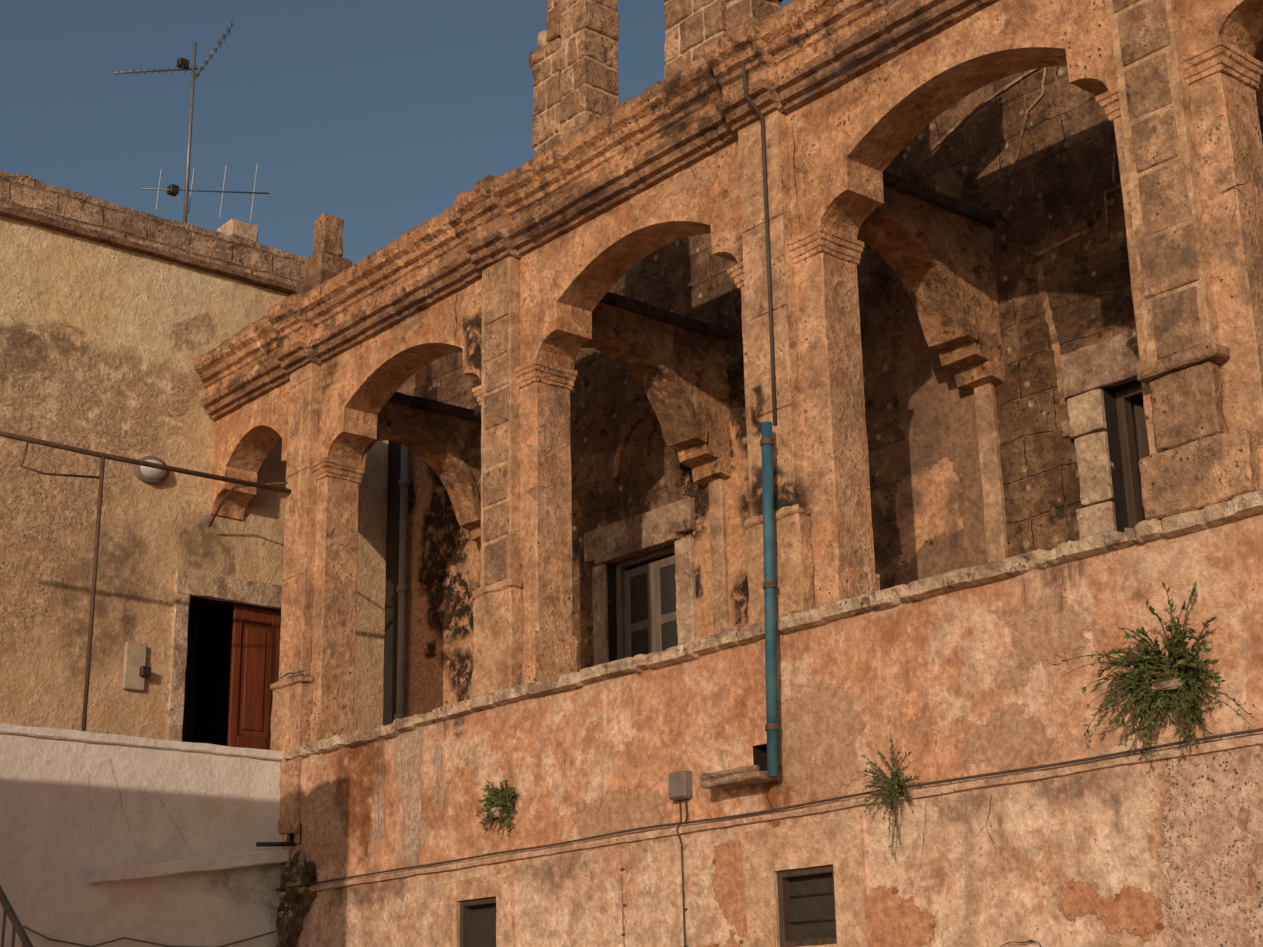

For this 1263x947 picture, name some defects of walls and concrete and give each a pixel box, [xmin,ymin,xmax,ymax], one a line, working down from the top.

flaking render [1058,726,1263,947]
flaking render [686,840,747,947]
flaking render [866,885,937,947]
crack [1000,939,1042,947]